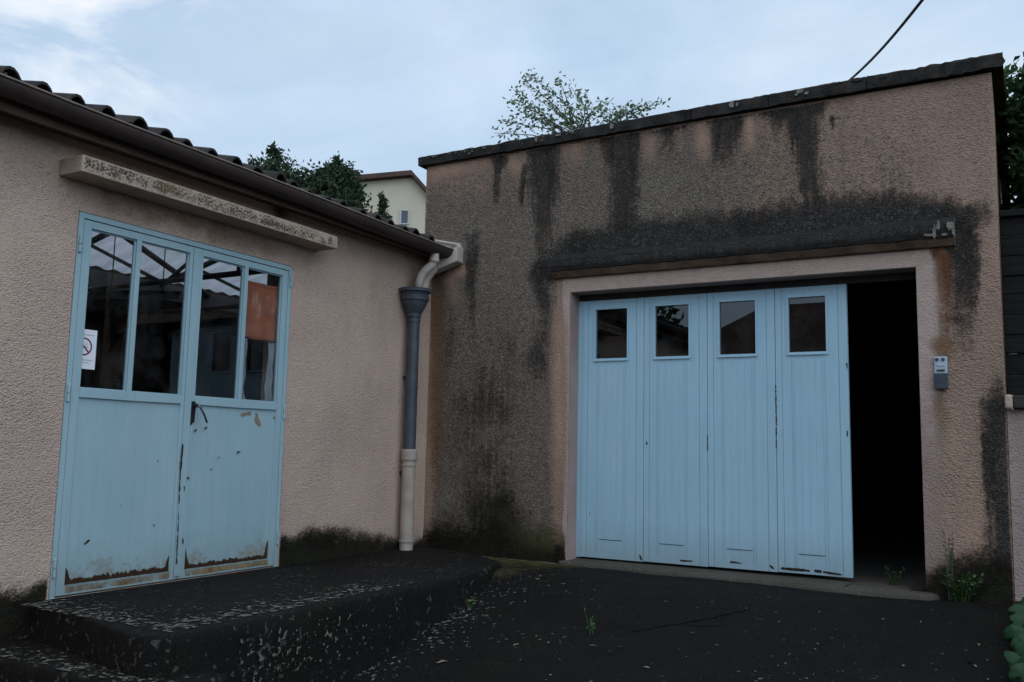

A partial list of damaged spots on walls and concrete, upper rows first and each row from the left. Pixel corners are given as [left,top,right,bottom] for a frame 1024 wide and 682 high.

water stain [425,102,839,548]
spalling [923,221,955,239]
water stain [944,225,981,337]
corrosion [64,556,169,593]
peeling [175,444,189,564]
corrosion [184,540,268,575]
water stain [909,380,1014,604]